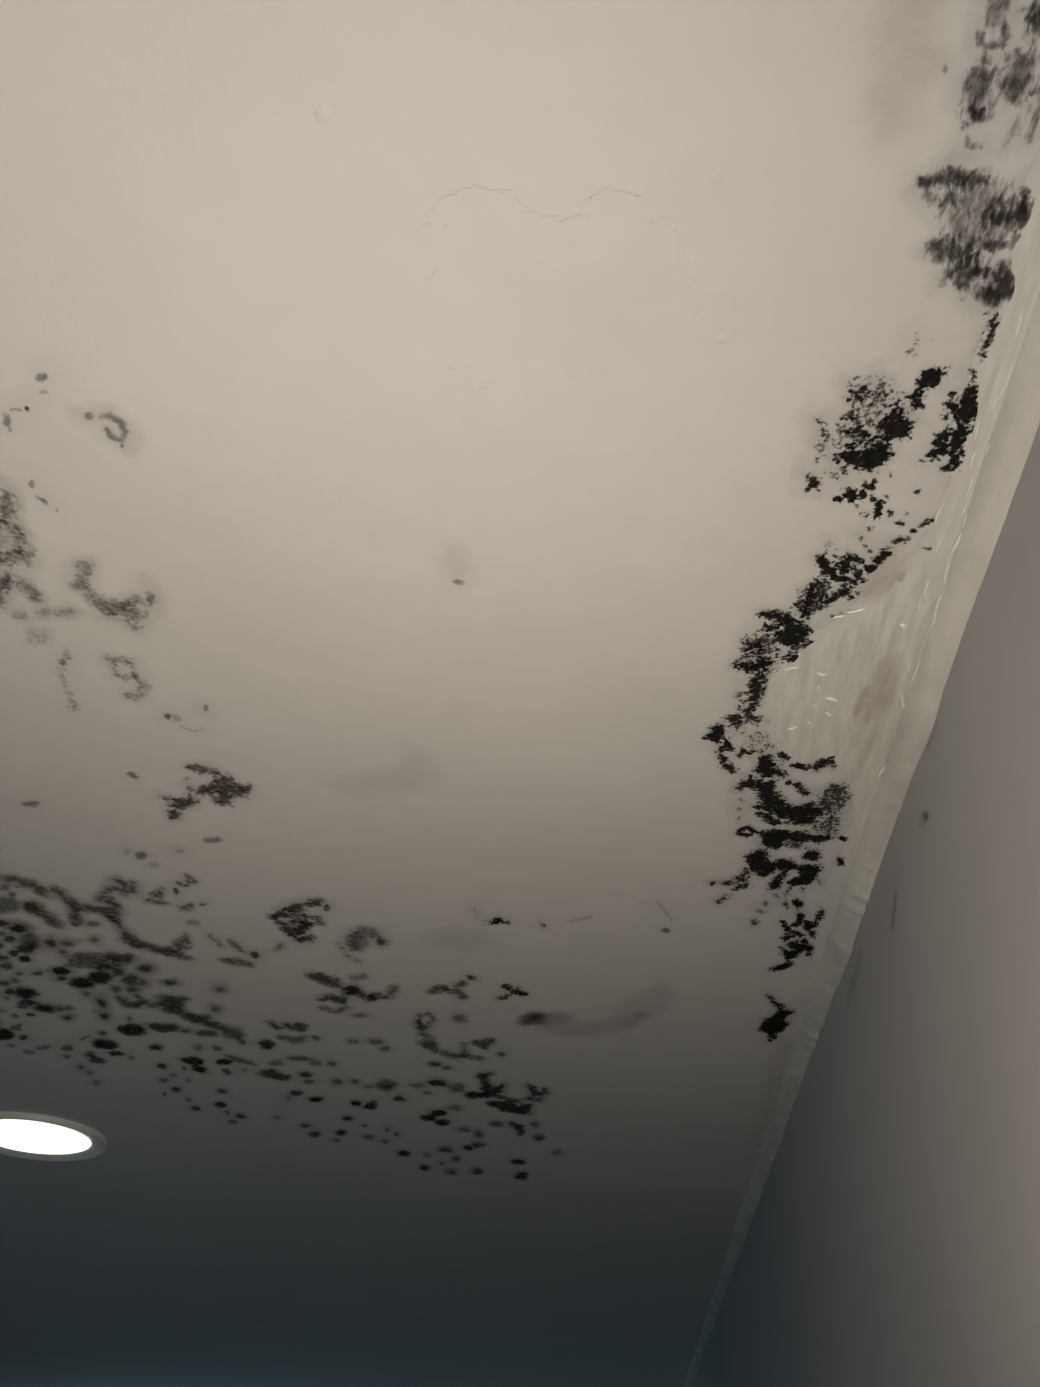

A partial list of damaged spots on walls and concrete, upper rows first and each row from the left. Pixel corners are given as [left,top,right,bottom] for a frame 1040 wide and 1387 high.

mould [1028,3,1040,33]
mould [966,1,1034,126]
mould [701,166,1033,972]
mould [164,765,251,820]
mould [271,899,328,943]
mould [0,879,241,1074]
damp [307,973,395,1003]
damp [497,984,528,1000]
damp [259,1023,305,1049]
mould [758,994,793,1042]
damp [260,1069,323,1102]
damp [419,1026,550,1174]